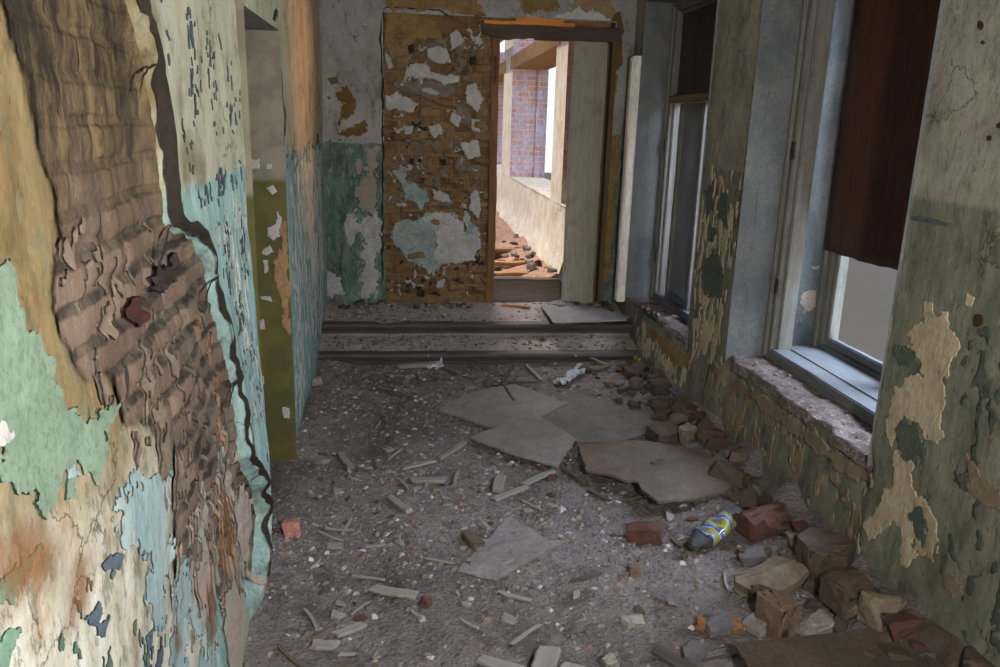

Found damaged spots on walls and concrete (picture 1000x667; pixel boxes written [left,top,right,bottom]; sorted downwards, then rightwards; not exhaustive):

flaking render [0,0,368,667]
crack [137,0,274,577]
flaking render [344,0,486,300]
peeling [806,301,1000,653]